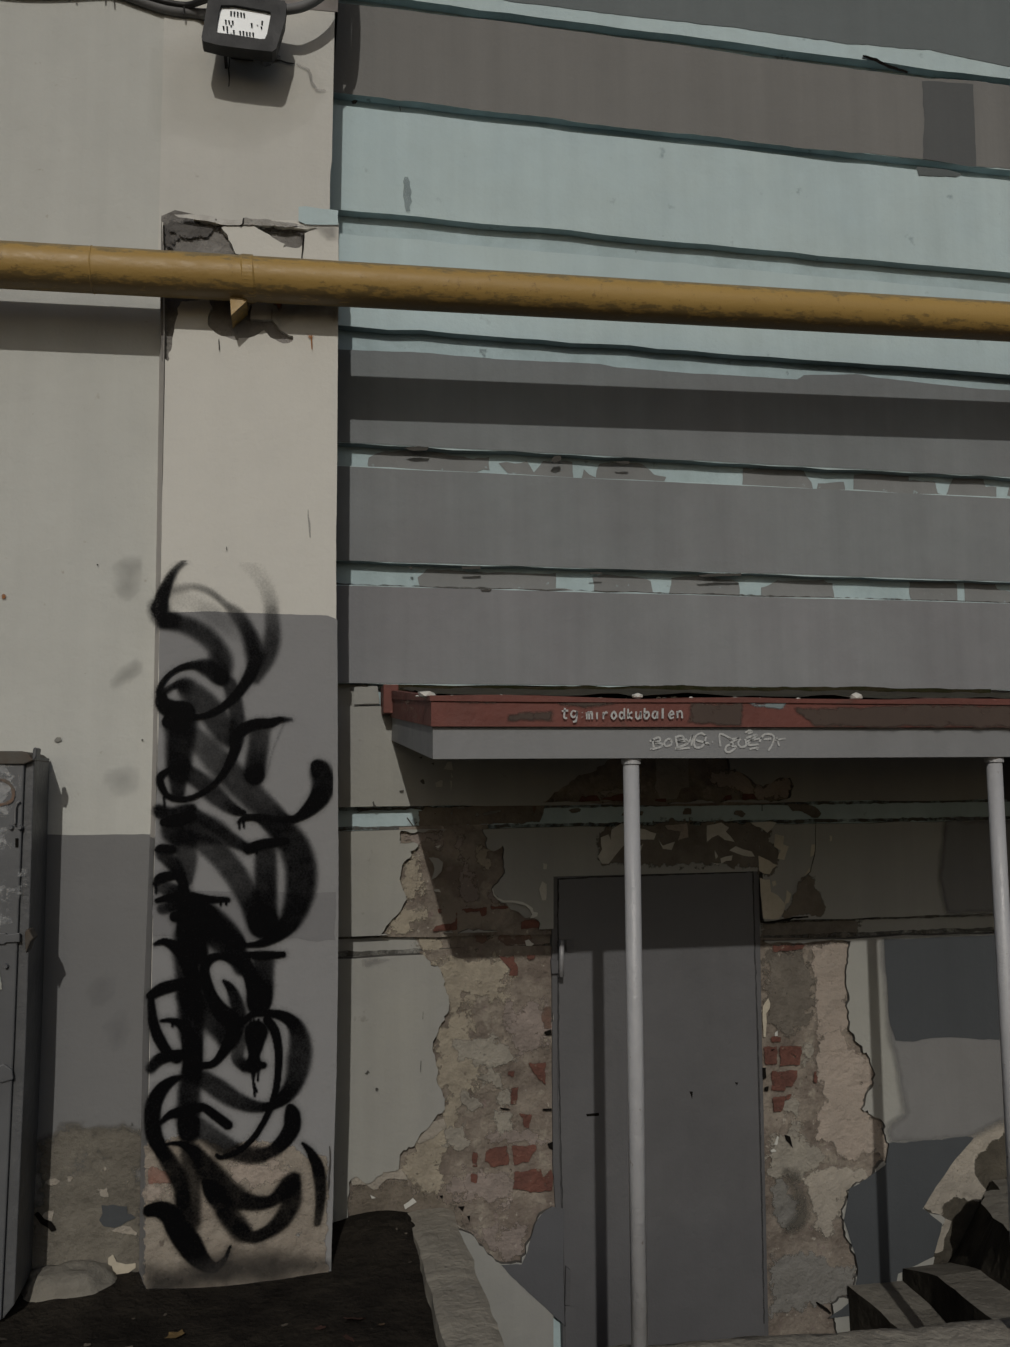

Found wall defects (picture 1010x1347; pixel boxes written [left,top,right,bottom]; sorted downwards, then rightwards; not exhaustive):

flaking render [161,210,307,254]
flaking render [160,297,293,362]
peeling [639,758,832,919]
flaking render [347,758,624,1262]
flaking render [31,1124,329,1289]
flaking render [760,938,889,1336]
flaking render [923,1121,1007,1264]